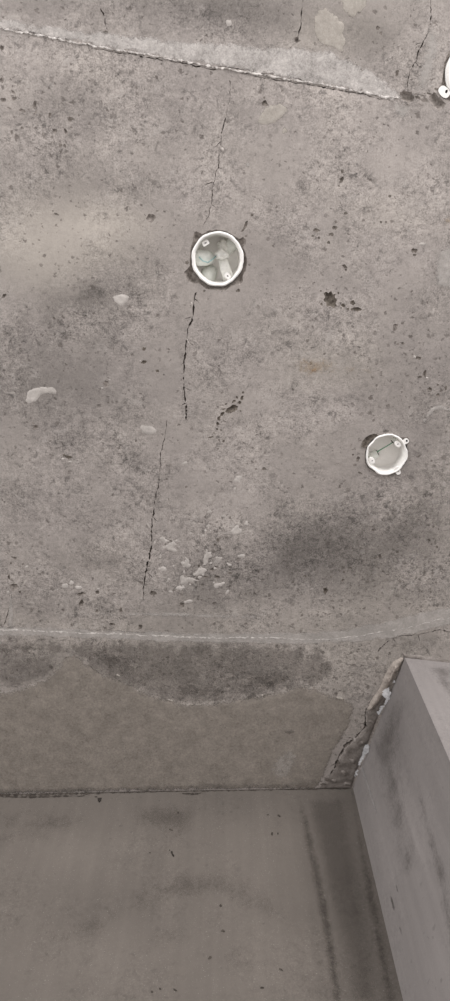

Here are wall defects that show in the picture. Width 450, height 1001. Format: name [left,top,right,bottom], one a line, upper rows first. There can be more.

crack [407,0,432,87]
crack [203,80,231,226]
crack [143,292,200,599]
peeling [0,656,390,803]